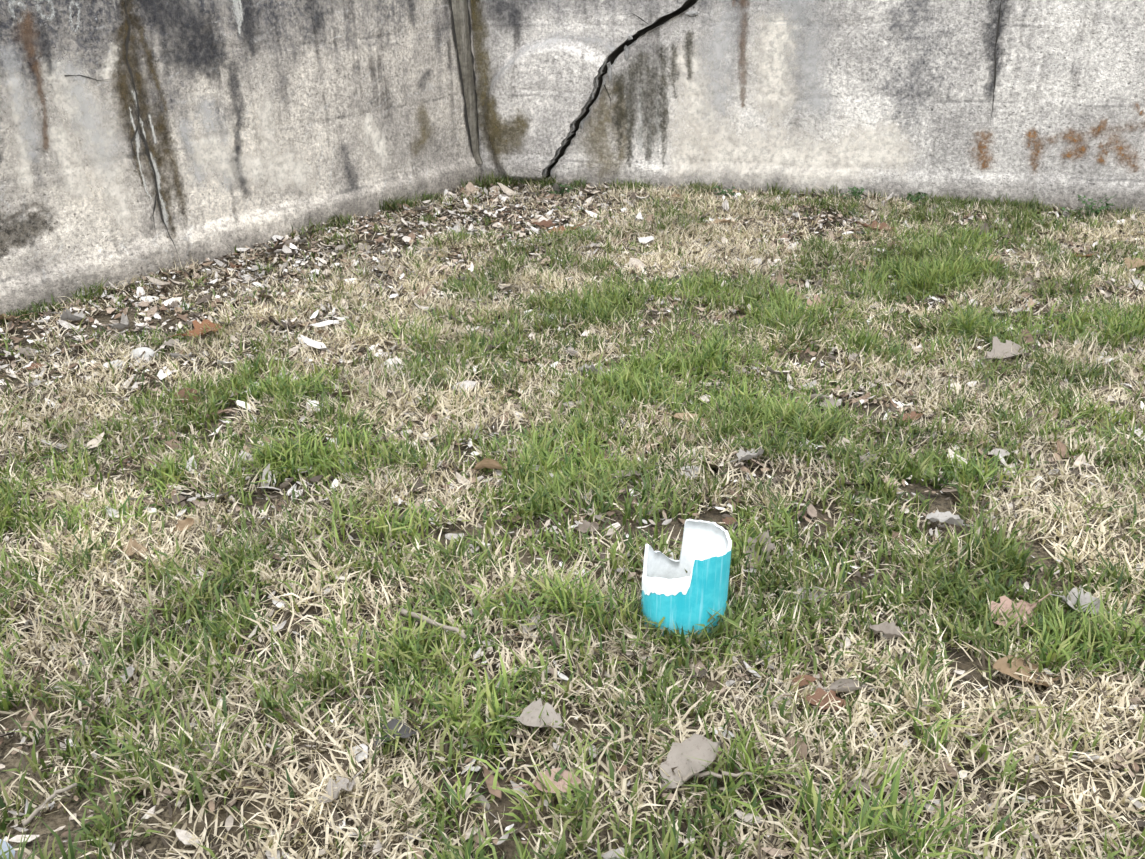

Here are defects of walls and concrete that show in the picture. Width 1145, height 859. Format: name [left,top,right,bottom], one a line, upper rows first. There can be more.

damp [5,0,311,228]
damp [361,114,392,167]
crack [544,0,698,183]
corrosion [732,0,747,107]
damp [613,0,942,193]
corrosion [972,132,993,169]
damp [986,0,1008,97]
corrosion [1026,104,1144,170]